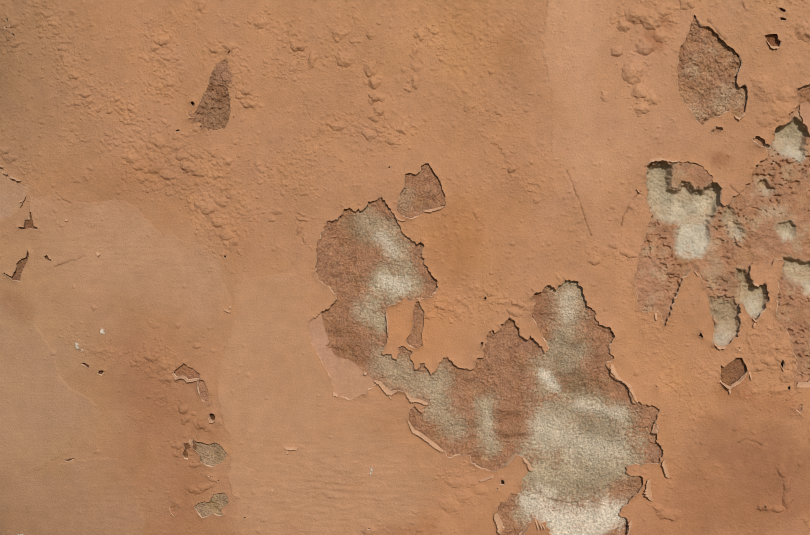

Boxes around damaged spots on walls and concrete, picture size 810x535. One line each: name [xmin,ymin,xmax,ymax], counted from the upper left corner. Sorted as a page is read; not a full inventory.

flaking render [765,34,780,49]
peeling [188,51,235,133]
peeling [677,15,747,133]
peeling [0,165,30,220]
peeling [4,252,29,281]
peeling [18,213,37,229]
flaking render [633,85,810,394]
flaking render [308,164,669,535]
peeling [172,363,215,423]
peeling [183,439,227,466]
peeling [195,493,228,517]